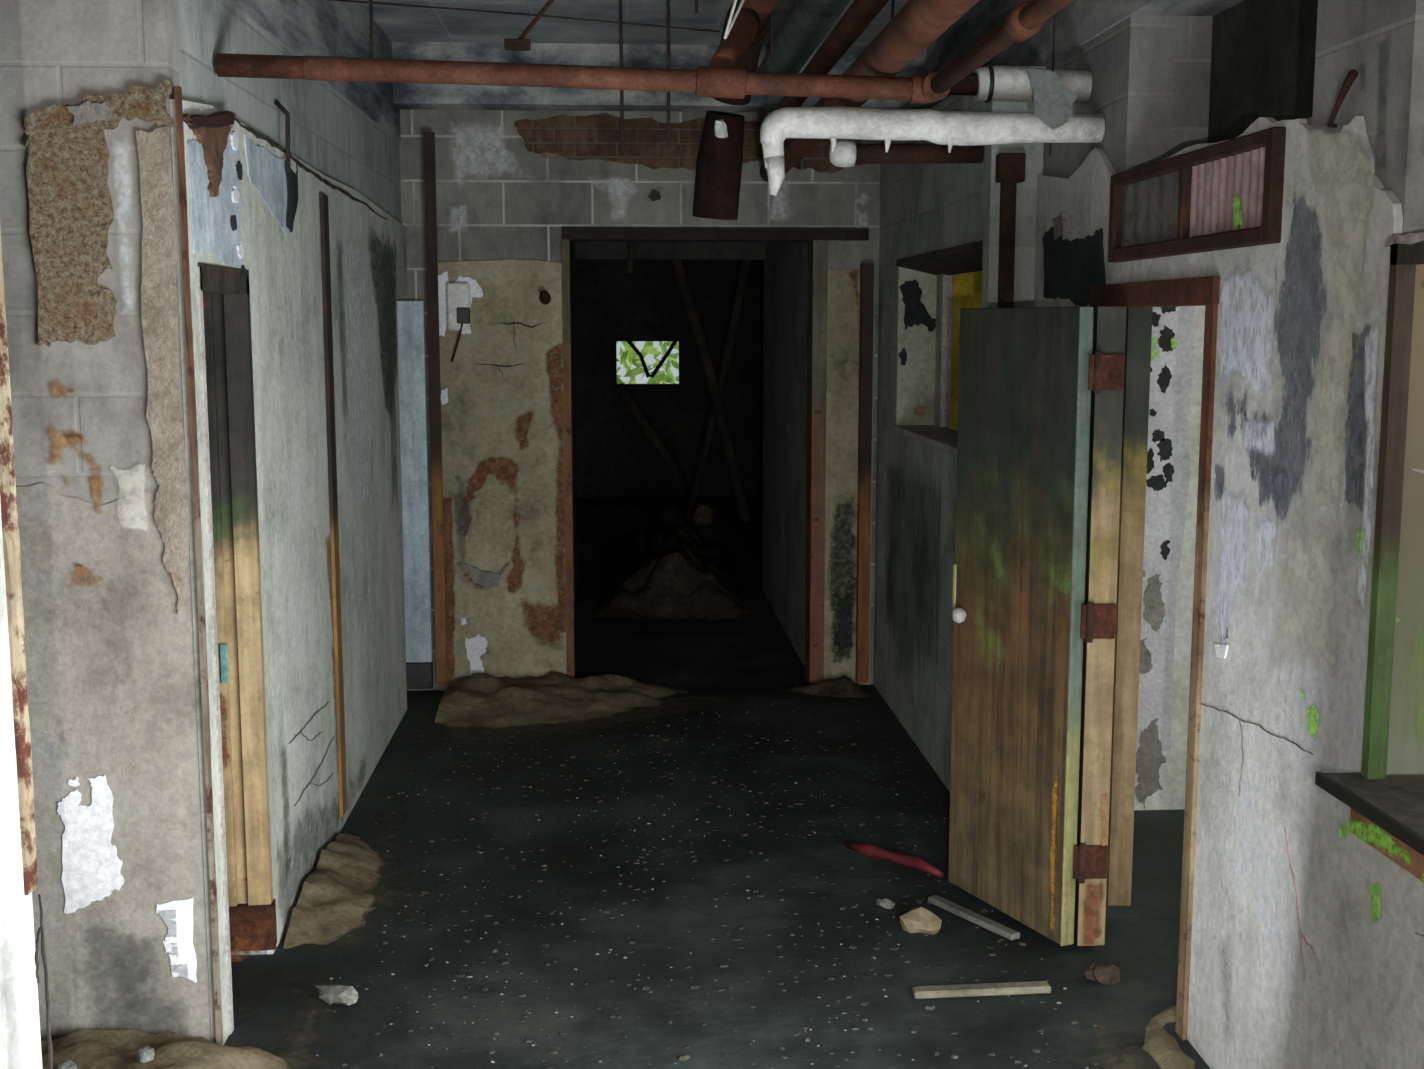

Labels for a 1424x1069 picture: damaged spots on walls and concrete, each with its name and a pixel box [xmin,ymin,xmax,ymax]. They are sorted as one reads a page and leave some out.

flaking render [23,79,298,615]
leakage [1308,130,1384,508]
rust [49,428,103,513]
rust [73,564,101,585]
rust [443,412,533,680]
rust [524,345,566,645]
leakage [829,498,857,662]
peeling [1135,306,1195,809]
leakage [1277,527,1335,663]
crack [1201,703,1314,797]
peeling [57,775,124,914]
peeling [156,897,197,982]